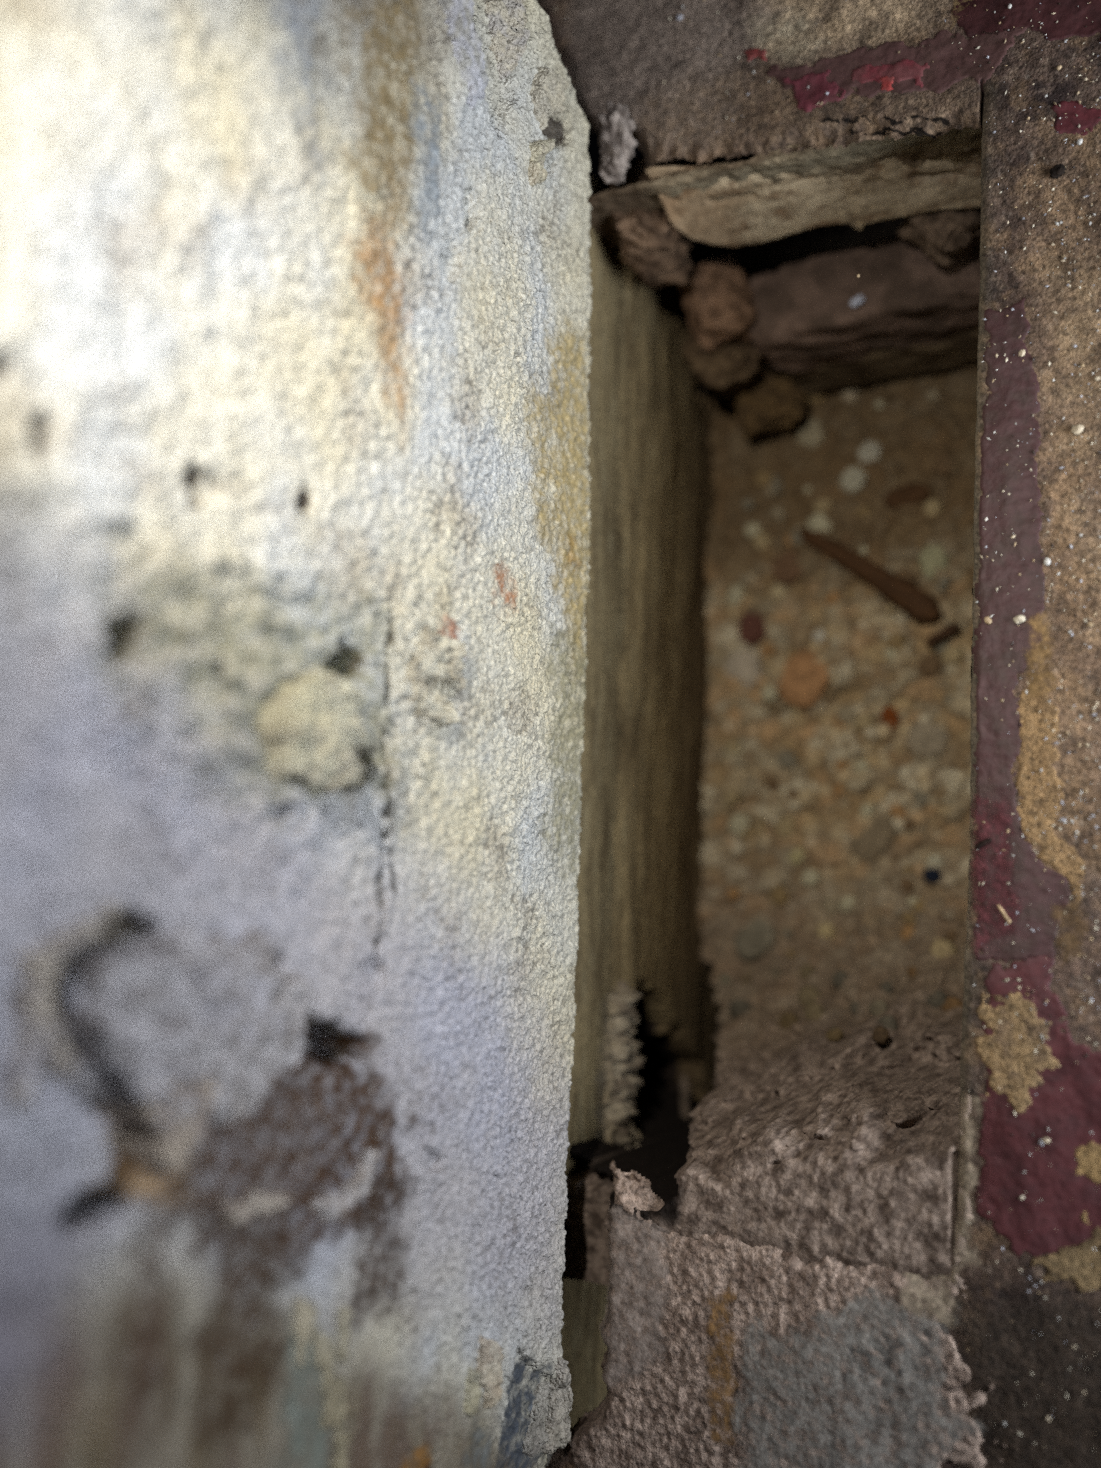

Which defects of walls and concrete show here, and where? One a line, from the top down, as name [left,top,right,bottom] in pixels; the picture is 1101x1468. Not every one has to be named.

peeling [743,0,1101,112]
peeling [1051,100,1101,138]
spalling [341,747,371,793]
peeling [971,298,1101,1292]